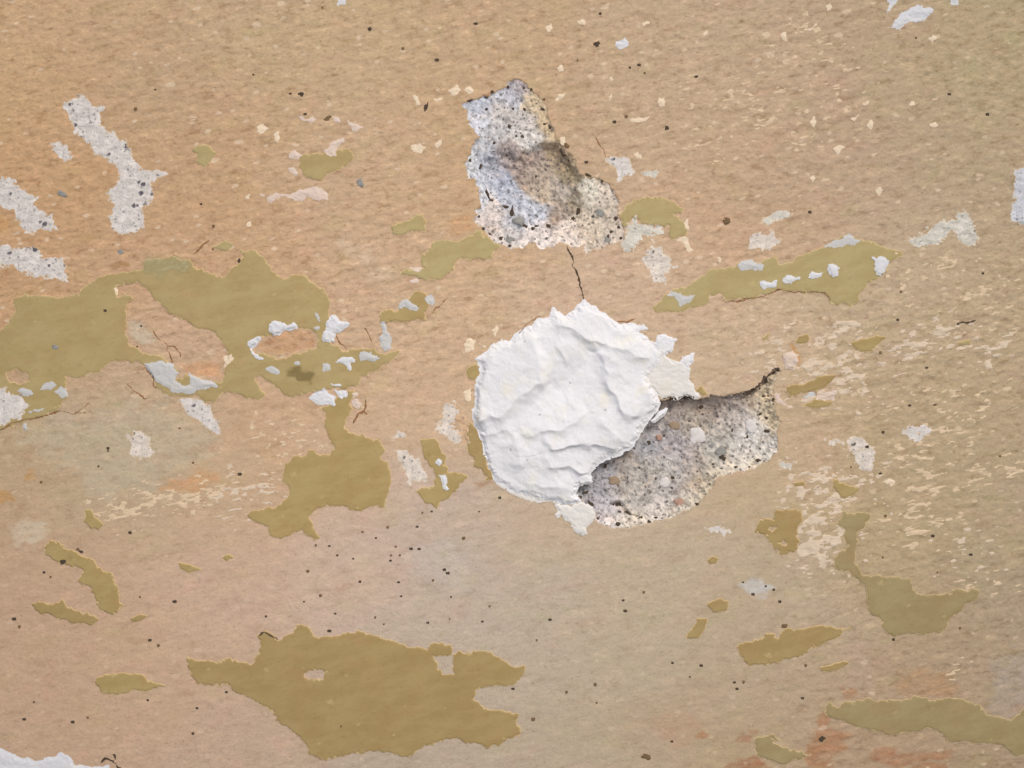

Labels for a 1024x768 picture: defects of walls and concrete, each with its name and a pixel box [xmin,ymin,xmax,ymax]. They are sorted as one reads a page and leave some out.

flaking render [0,176,69,283]
flaking render [50,94,169,236]
spalling [434,79,695,307]
crack [567,247,584,299]
flaking render [0,381,68,431]
spalling [144,360,221,434]
spalling [247,320,298,375]
spalling [314,312,350,343]
spalling [309,321,392,409]
spalling [497,209,1024,595]